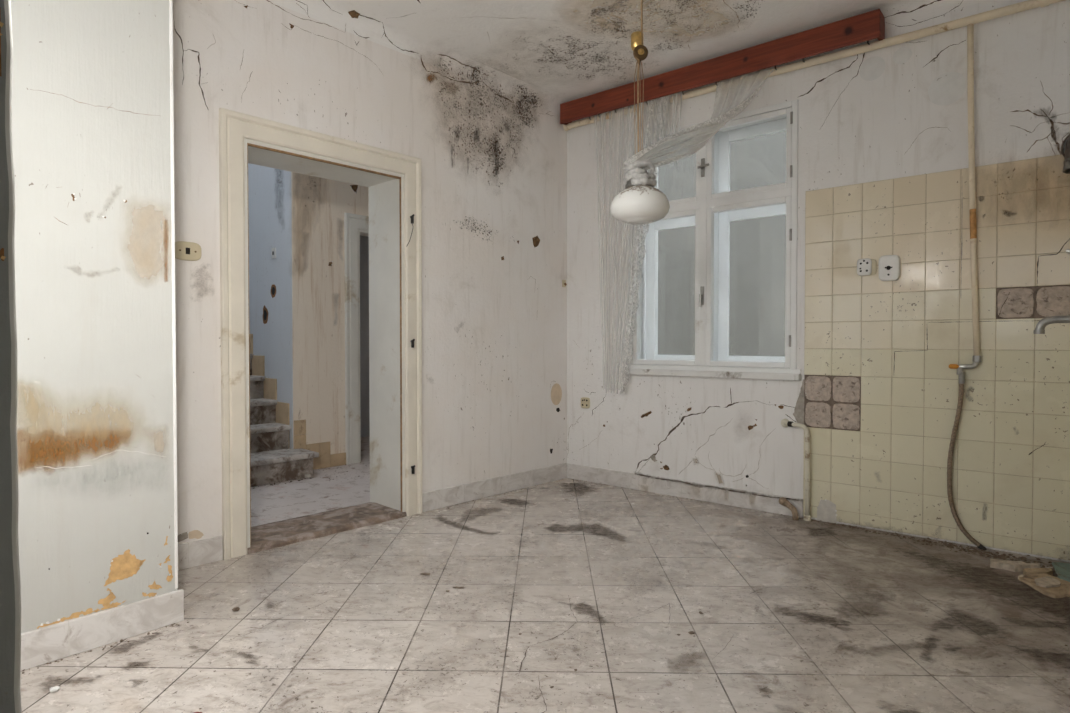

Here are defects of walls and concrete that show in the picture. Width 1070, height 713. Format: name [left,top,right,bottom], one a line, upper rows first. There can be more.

crack [173,0,216,109]
crack [236,0,421,70]
water stain [421,0,763,187]
crack [1010,80,1070,155]
crack [1037,238,1070,283]
crack [637,387,796,489]
peeling [37,549,146,629]
peeling [142,530,204,597]